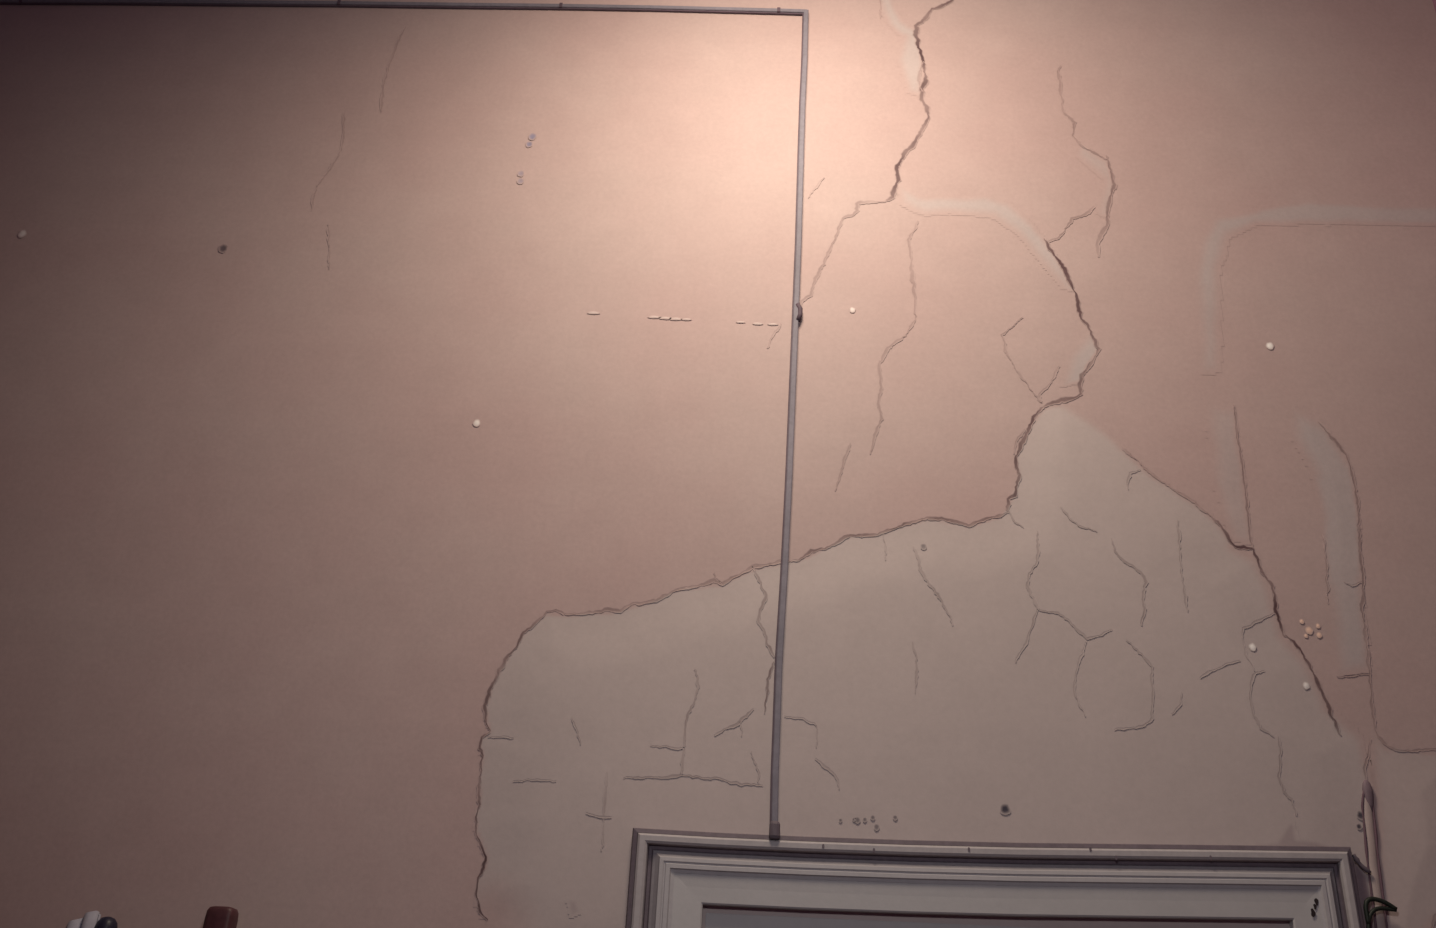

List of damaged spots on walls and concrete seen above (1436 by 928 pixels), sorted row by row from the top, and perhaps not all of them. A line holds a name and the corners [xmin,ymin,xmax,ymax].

crack [474,0,1436,920]